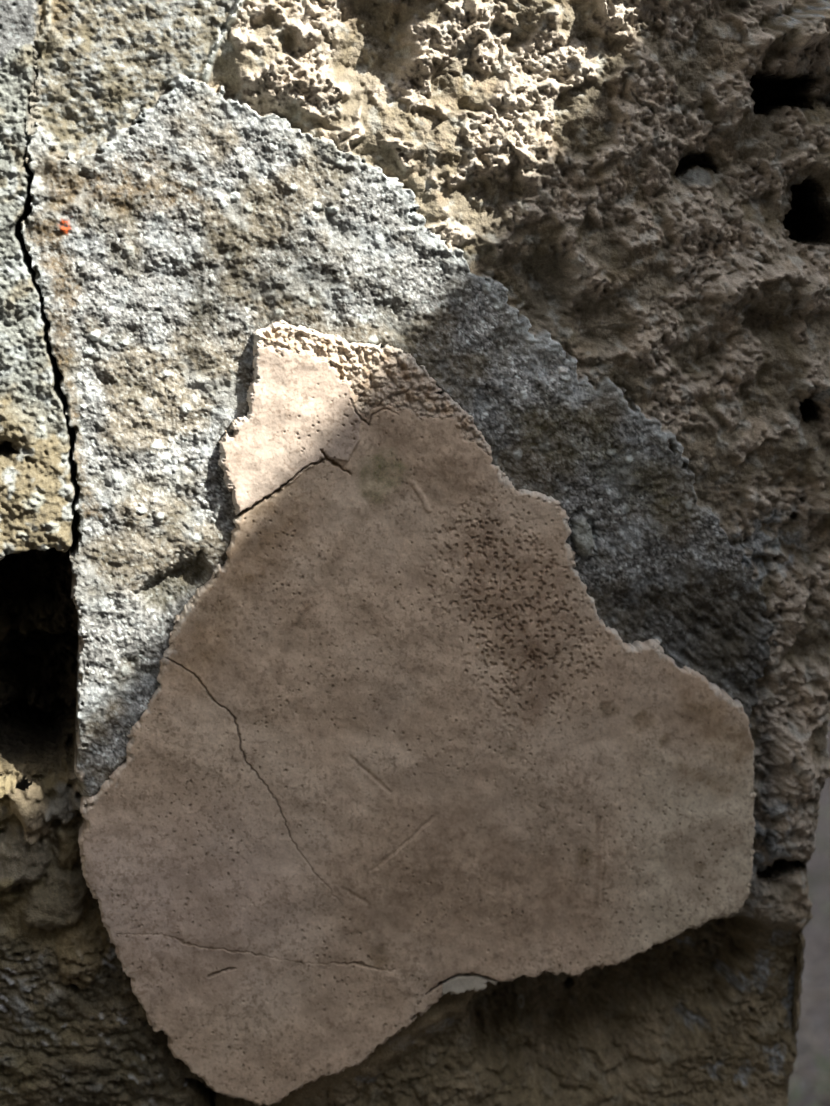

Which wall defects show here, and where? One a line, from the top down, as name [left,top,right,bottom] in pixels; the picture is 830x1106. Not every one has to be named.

crack [14,0,82,558]
crack [234,449,351,520]
spalling [0,547,81,793]
crack [166,658,338,899]
crack [117,933,396,978]
crack [184,1077,217,1106]